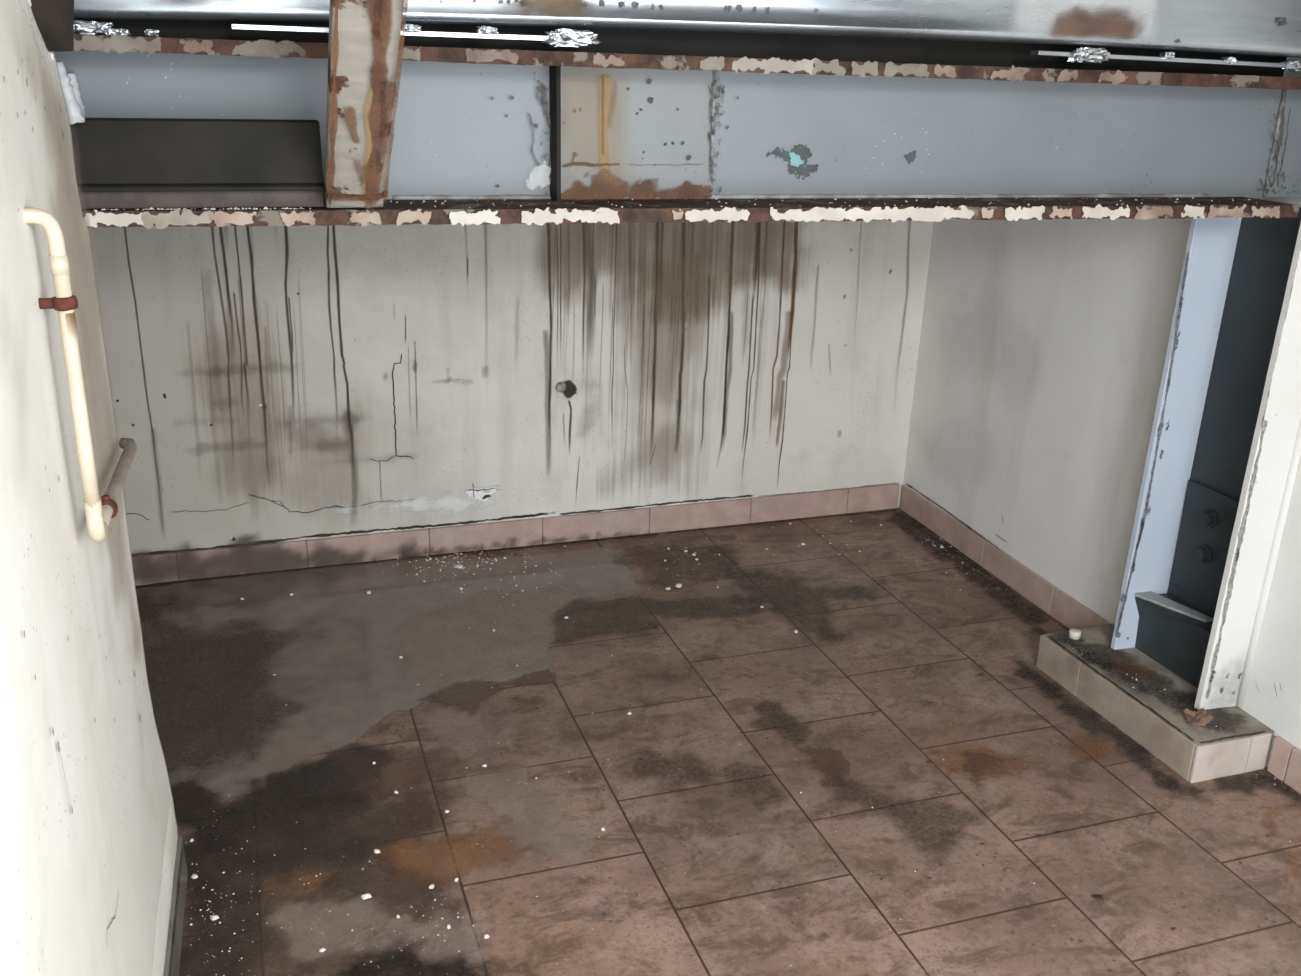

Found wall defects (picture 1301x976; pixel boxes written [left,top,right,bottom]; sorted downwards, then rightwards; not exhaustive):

peeling [84,209,257,229]
rust [327,0,408,205]
peeling [521,73,620,226]
rust [561,76,711,200]
peeling [672,57,956,223]
peeling [766,106,1295,222]
leakage [211,226,267,445]
leakage [327,225,353,454]
crack [371,354,413,462]
leakage [544,221,791,463]
crack [179,494,414,513]
leakage [132,537,865,976]